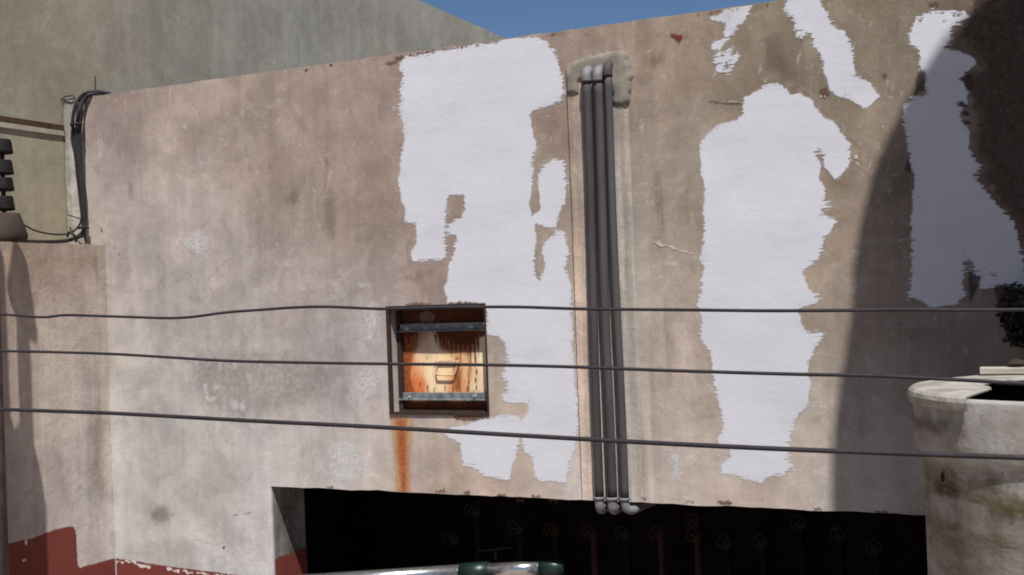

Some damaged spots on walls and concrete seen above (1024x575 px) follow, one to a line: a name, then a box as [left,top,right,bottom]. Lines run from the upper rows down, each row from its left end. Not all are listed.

corrosion [393,308,487,492]